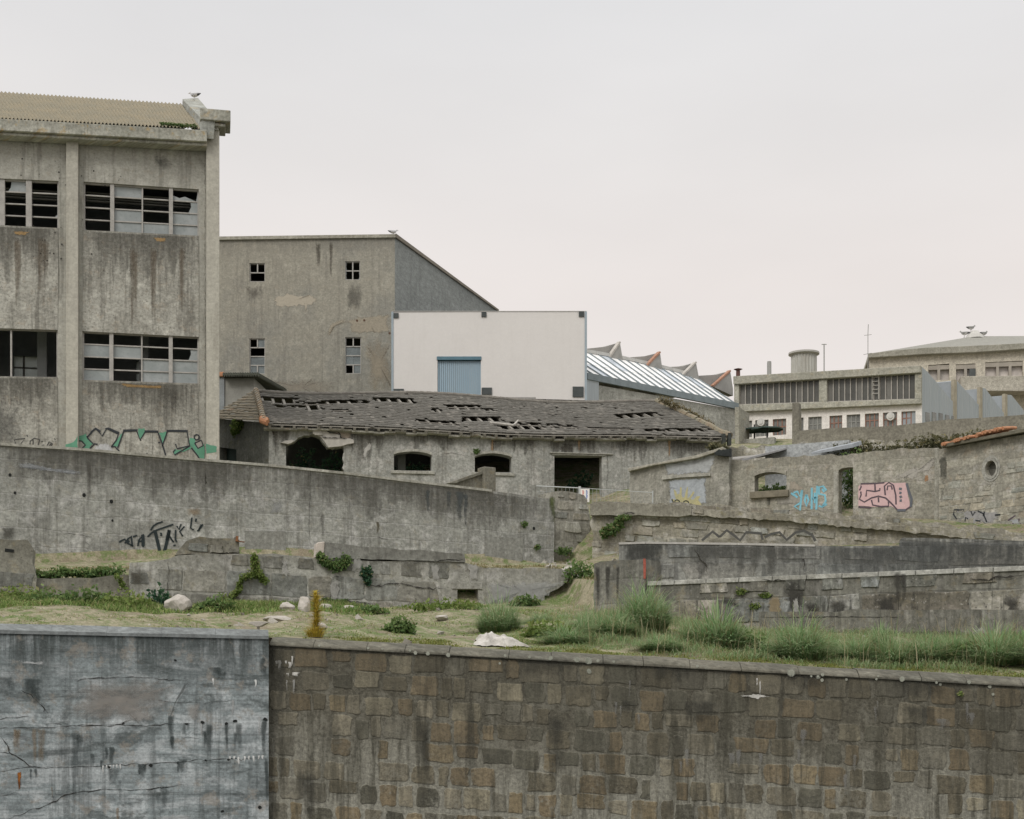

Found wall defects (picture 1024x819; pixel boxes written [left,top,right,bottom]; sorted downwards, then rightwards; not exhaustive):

water stain [787,585,818,612]
crack [0,691,243,819]